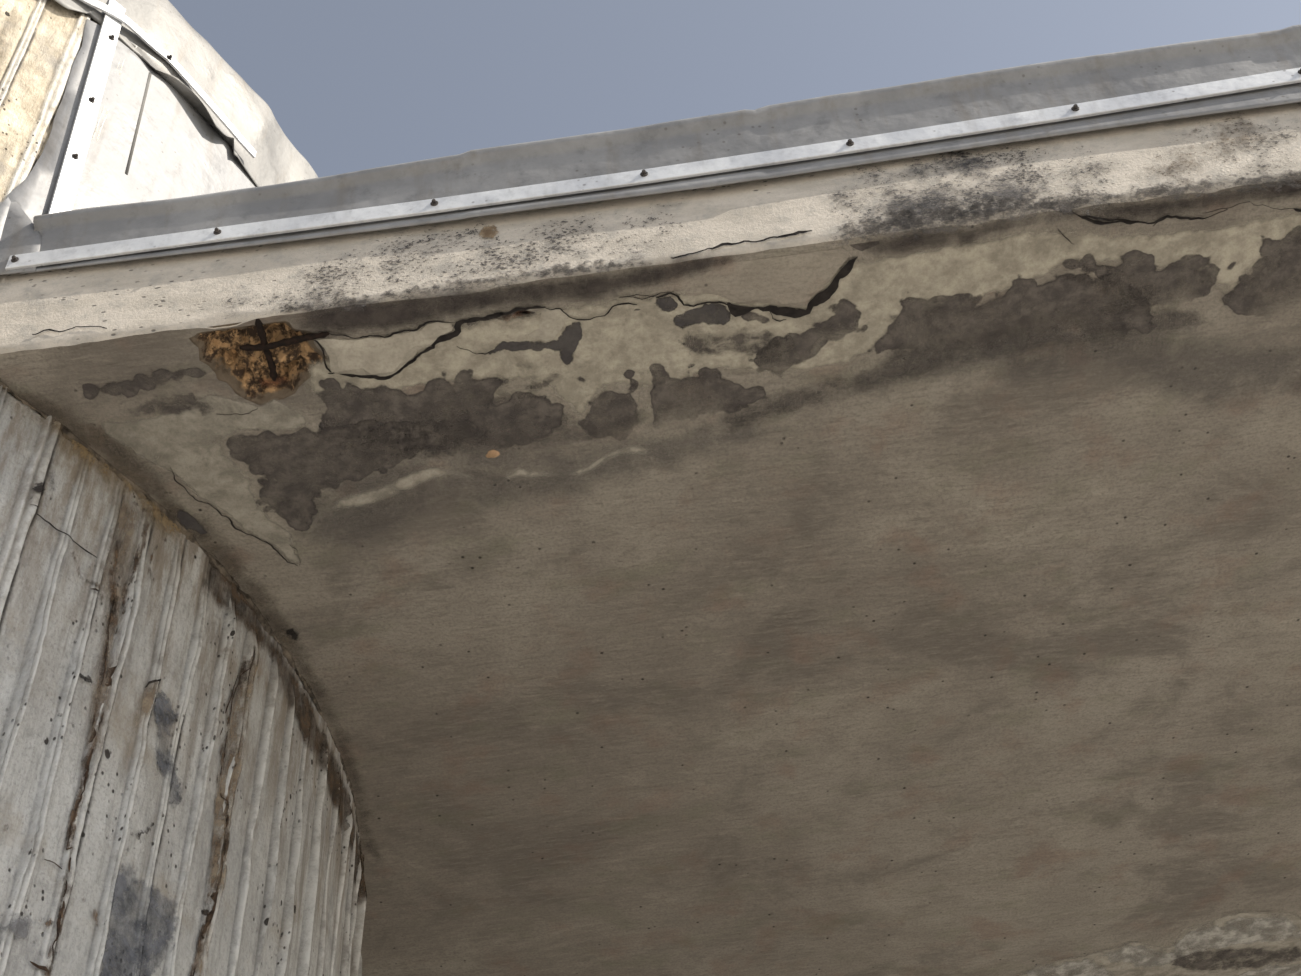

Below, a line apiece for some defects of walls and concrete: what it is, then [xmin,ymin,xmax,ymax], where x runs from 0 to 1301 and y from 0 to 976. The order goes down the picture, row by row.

damp [1135,113,1299,187]
crack [671,230,812,259]
crack [1053,201,1301,244]
spalling [189,308,570,405]
crack [314,257,858,380]
damp [82,142,1301,563]